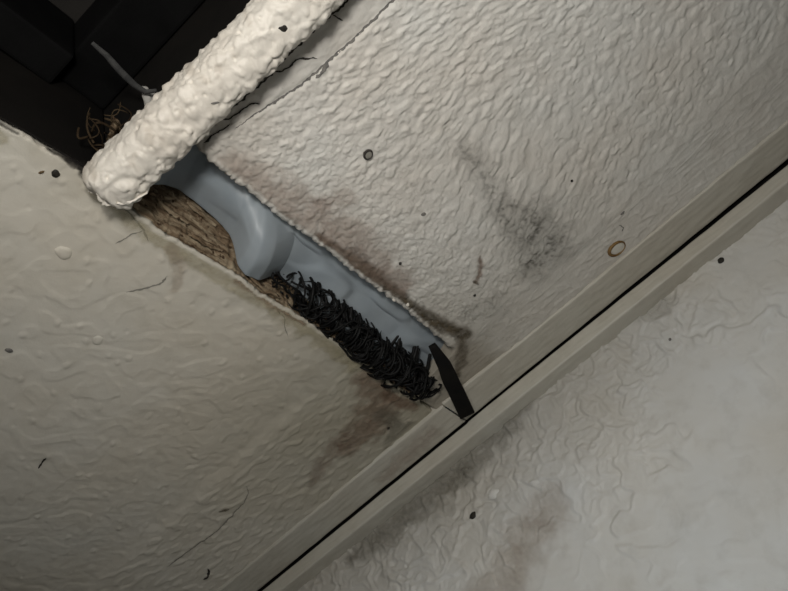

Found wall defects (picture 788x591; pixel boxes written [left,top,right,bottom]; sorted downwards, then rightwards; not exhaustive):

spalling [88,185,410,393]